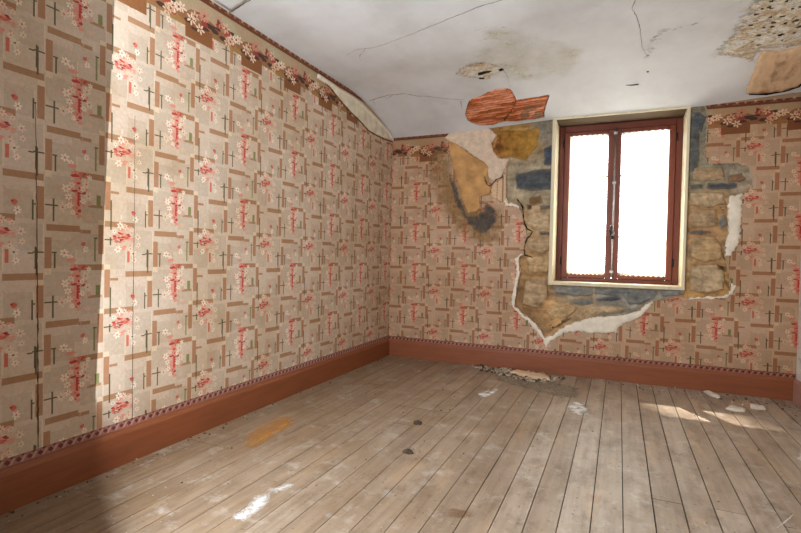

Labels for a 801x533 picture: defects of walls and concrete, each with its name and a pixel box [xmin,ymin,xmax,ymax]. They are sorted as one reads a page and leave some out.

flaking render [457,62,504,79]
flaking render [718,0,801,59]
water stain [432,153,499,242]
flaking render [444,88,753,337]